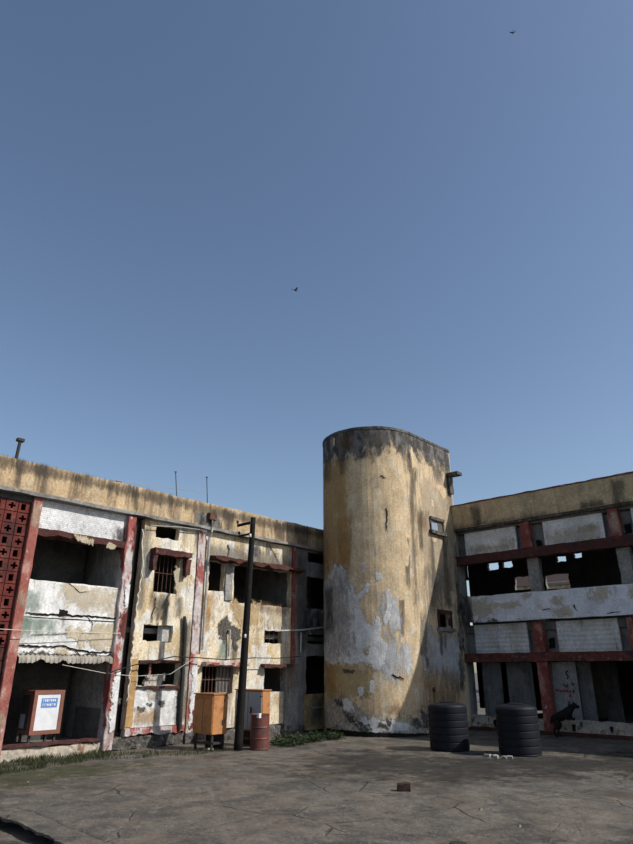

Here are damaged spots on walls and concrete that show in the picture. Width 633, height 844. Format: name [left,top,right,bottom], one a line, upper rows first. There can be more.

peeling [20,584,130,657]
peeling [324,543,465,737]
peeling [109,670,121,732]
peeling [130,673,179,728]
peeling [187,666,198,733]